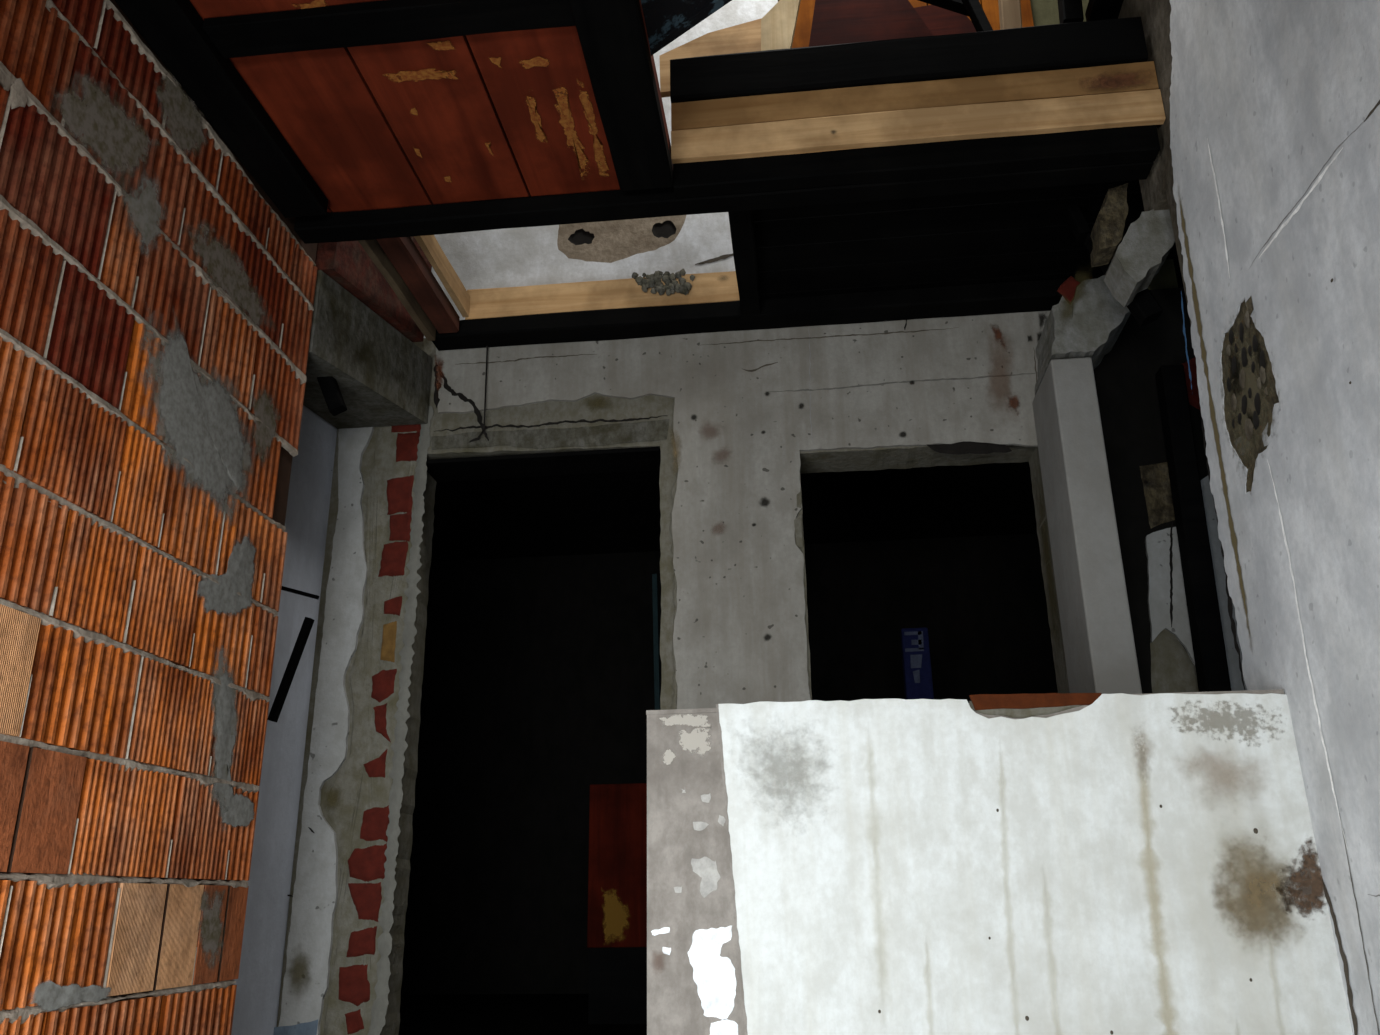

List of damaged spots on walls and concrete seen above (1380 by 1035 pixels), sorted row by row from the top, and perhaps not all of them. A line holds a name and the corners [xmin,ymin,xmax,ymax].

crack [434,354,667,442]
spalling [1221,296,1280,493]
peeling [659,398,711,765]
peeling [682,789,725,831]
peeling [691,857,721,898]
rust [1276,840,1325,915]
peeling [651,927,671,955]
peeling [688,925,738,1035]
crack [1341,826,1380,1035]